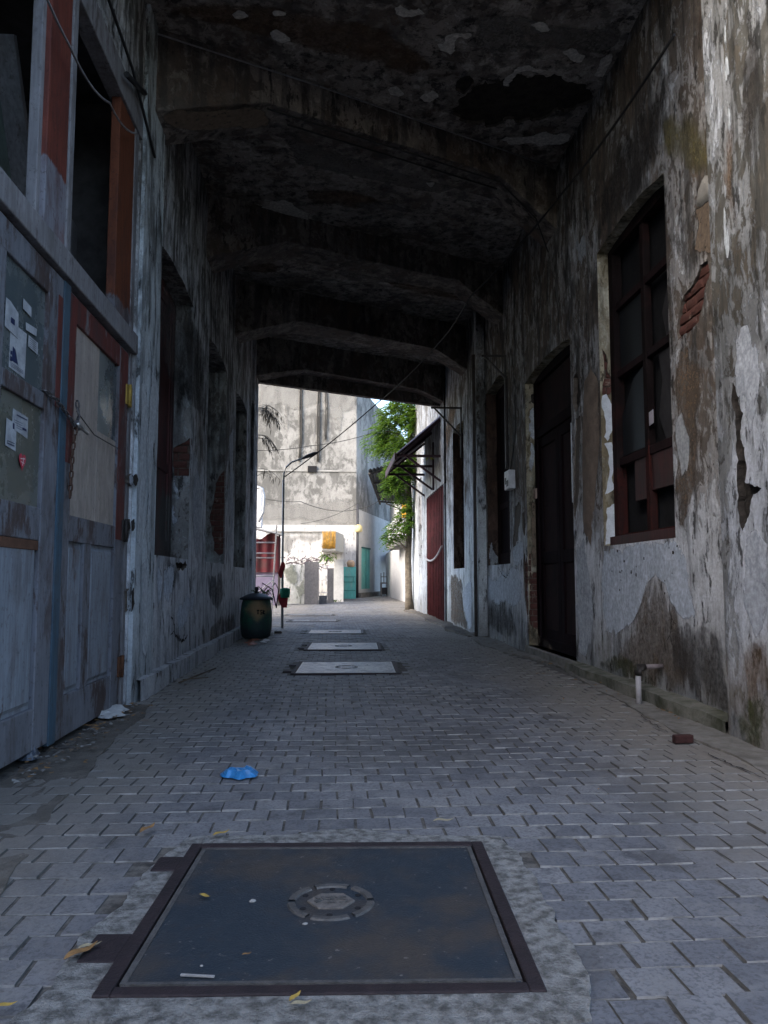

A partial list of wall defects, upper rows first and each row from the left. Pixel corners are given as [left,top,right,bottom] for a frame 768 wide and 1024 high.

spalling [453,54,613,125]
peeling [502,132,571,147]
flaking render [675,201,711,526]
peeling [735,325,760,431]
flaking render [172,438,192,526]
flaking render [210,471,226,555]
spalling [742,444,761,518]
water stain [450,575,467,629]
water stain [618,580,728,709]